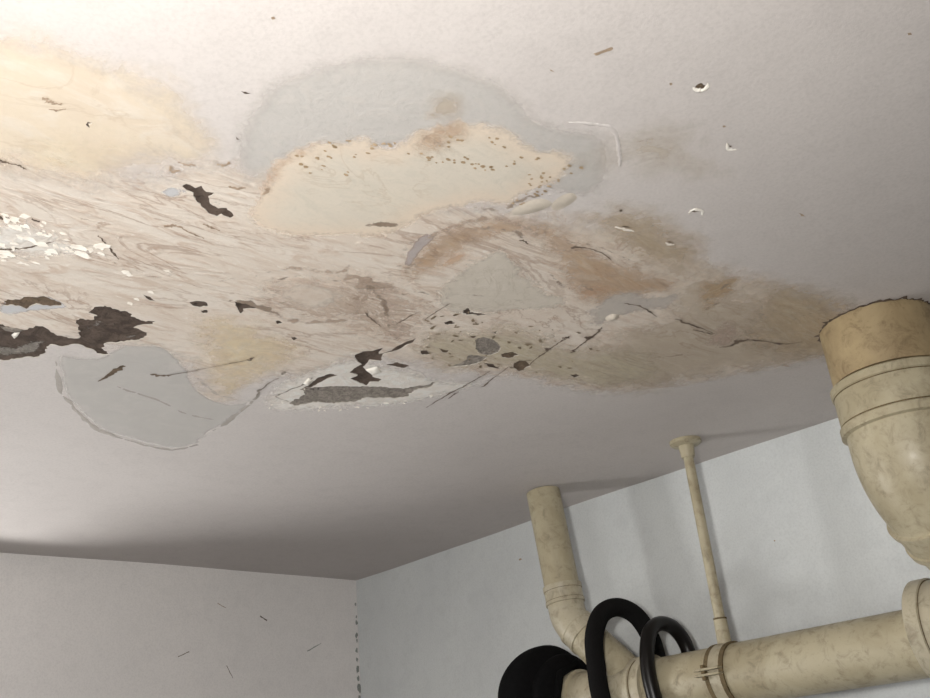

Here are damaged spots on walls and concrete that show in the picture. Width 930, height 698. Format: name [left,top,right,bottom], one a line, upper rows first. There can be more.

spalling [693,83,710,93]
peeling [0,213,111,266]
spalling [164,184,234,218]
peeling [251,122,571,236]
water stain [0,38,843,402]
crack [624,296,930,348]
peeling [0,291,473,451]
spalling [452,331,530,371]